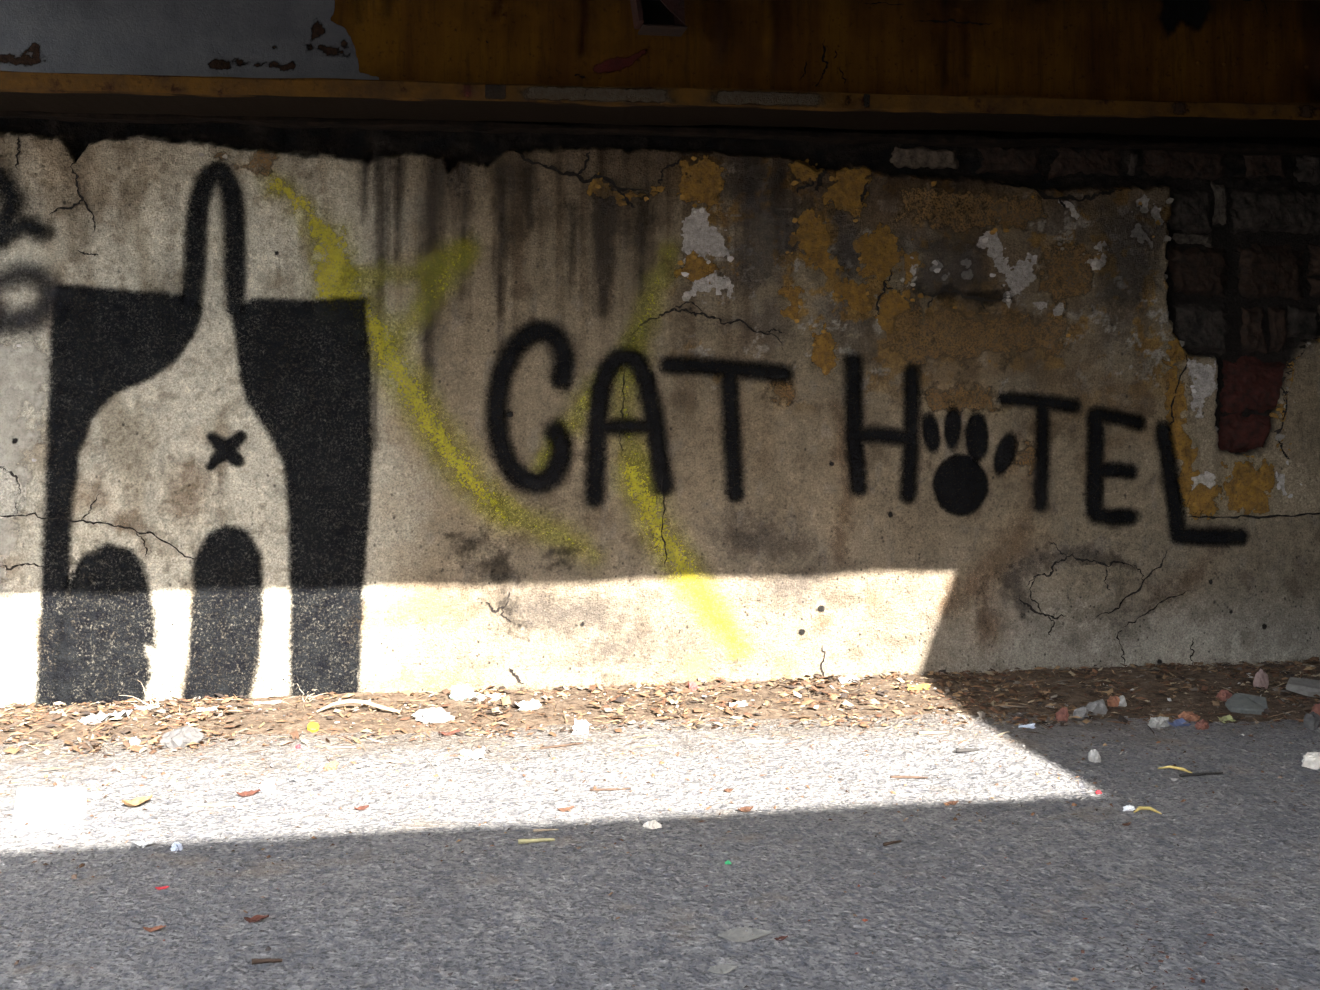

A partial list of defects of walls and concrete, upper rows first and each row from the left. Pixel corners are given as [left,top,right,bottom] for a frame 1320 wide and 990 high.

rust [0,42,46,66]
rust [208,45,296,71]
rust [306,18,350,58]
water stain [362,152,403,419]
water stain [423,156,469,380]
water stain [593,186,616,316]
peeling [811,322,837,375]
peeling [785,159,1064,342]
spalling [890,146,1320,520]
crack [0,562,45,570]
crack [0,466,209,560]
crack [1019,542,1188,665]